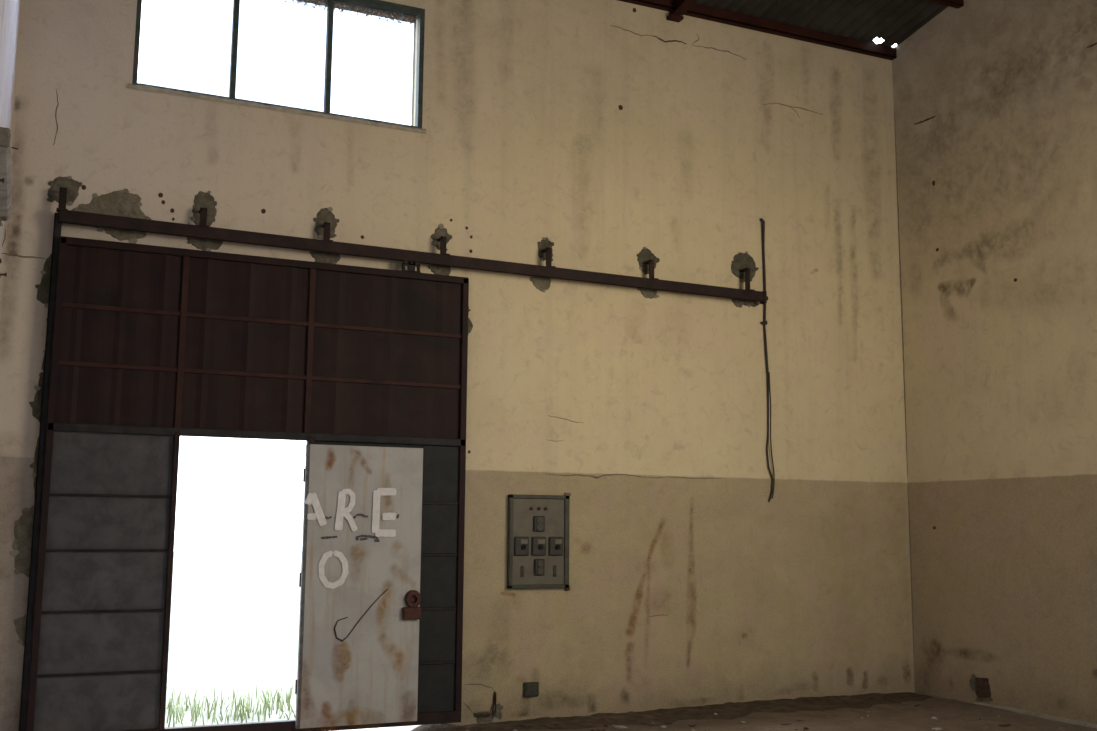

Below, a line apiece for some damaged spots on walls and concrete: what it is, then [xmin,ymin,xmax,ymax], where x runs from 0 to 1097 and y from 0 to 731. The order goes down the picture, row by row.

crack [610,25,747,60]
crack [52,90,60,145]
flaking render [47,176,152,220]
flaking render [187,191,223,251]
flaking render [309,207,341,264]
flaking render [430,219,452,251]
flaking render [530,276,551,293]
flaking render [537,237,554,261]
flaking render [637,247,660,275]
flaking render [731,251,759,283]
flaking render [732,299,760,308]
flaking render [9,437,39,577]